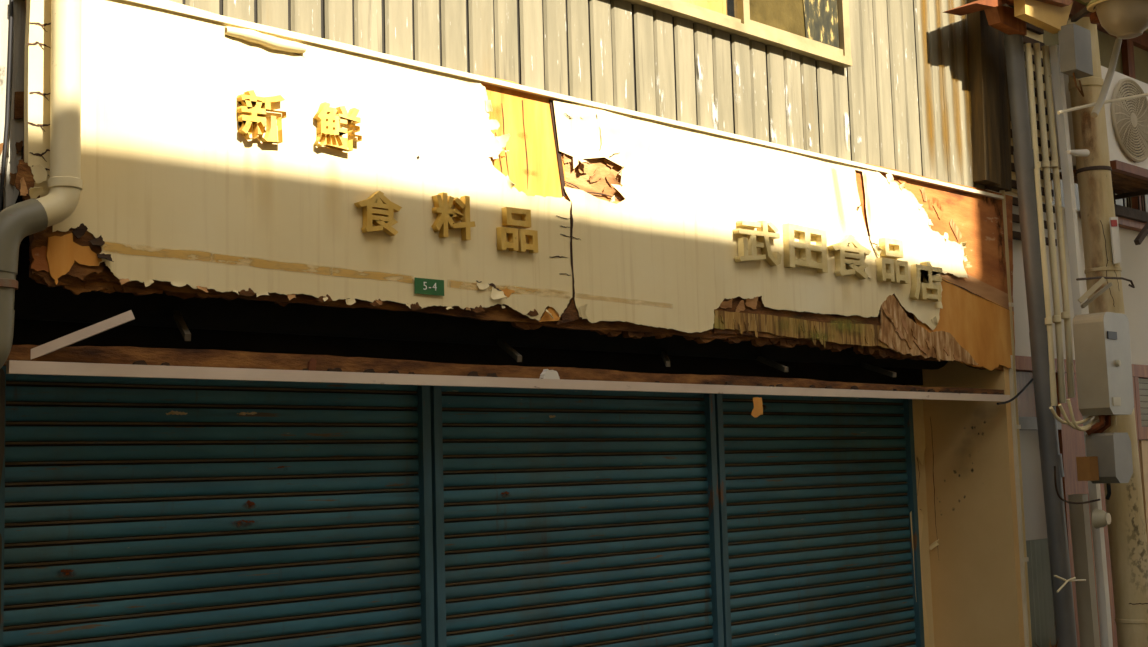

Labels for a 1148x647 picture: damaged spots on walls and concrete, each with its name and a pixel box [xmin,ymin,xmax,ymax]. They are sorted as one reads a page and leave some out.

peeling [476,74,625,204]
peeling [72,223,114,262]
spalling [171,280,208,293]
spalling [233,288,269,297]
spalling [317,294,356,305]
crack [550,201,579,300]
peeling [720,297,758,312]
peeling [866,163,1015,371]
spalling [12,319,923,385]